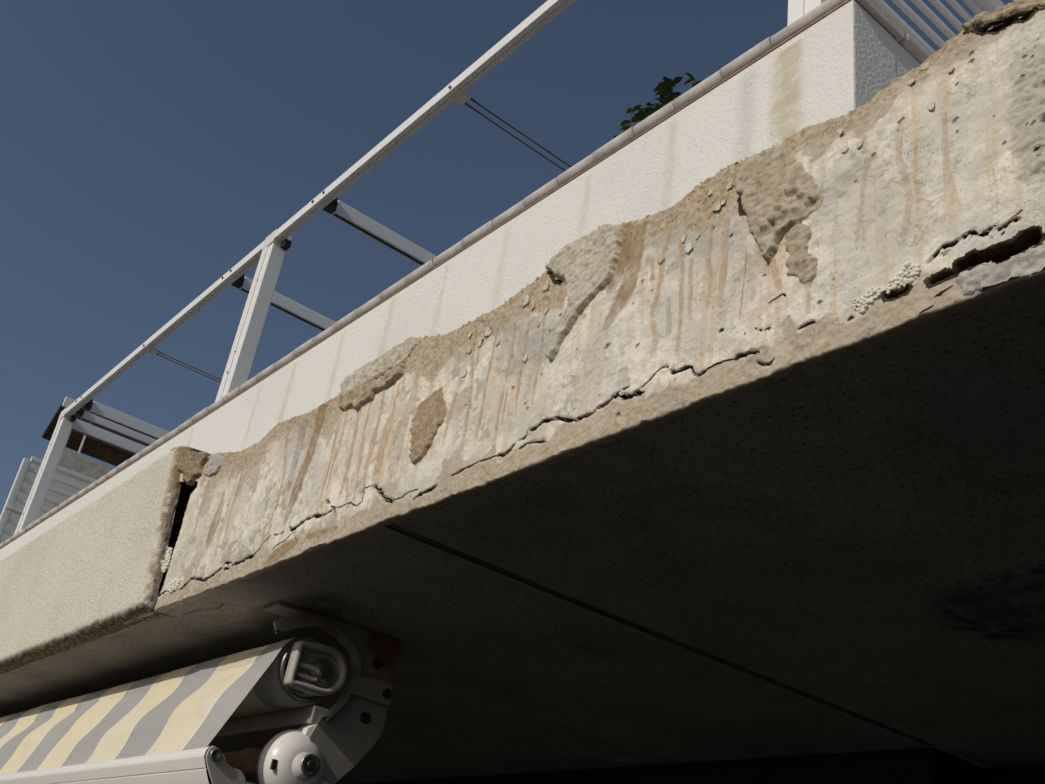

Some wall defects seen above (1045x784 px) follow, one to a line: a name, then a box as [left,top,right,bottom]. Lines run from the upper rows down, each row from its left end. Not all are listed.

hole [1029,140,1045,158]
peeling [685,157,750,211]
crack [927,209,1023,264]
peeling [521,271,567,332]
corrosion [607,222,692,333]
crack [798,320,815,331]
crack [919,285,954,316]
corrosion [444,323,497,436]
spalling [171,447,232,486]
corrosion [323,378,405,499]
spalling [407,386,447,465]
crack [157,246,787,615]